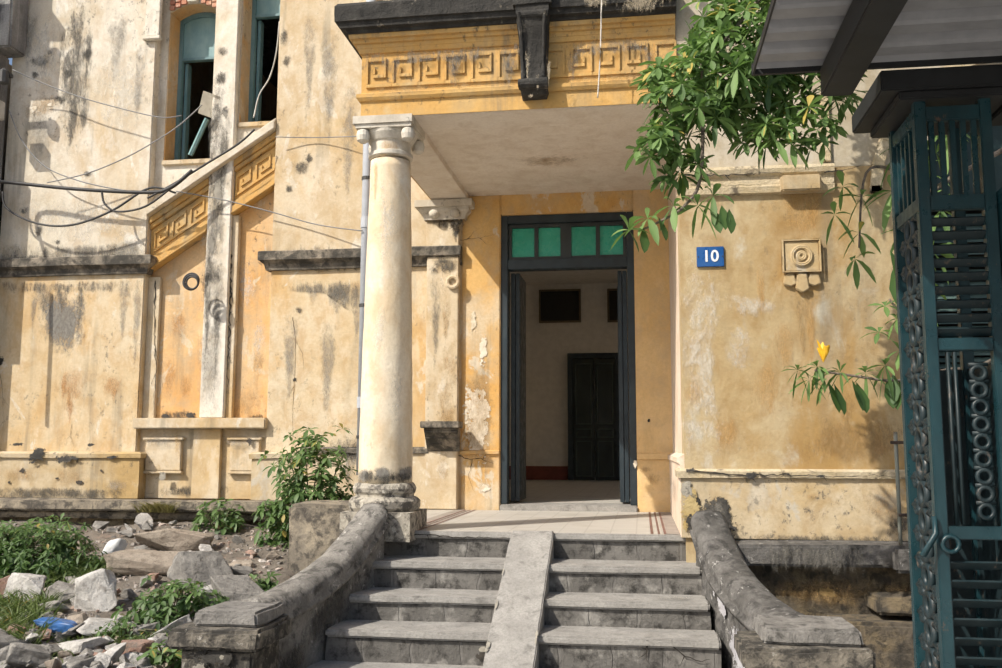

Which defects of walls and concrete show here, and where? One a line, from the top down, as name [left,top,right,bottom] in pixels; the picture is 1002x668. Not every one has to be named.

water stain [29,14,91,145]
crack [151,281,159,415]
water stain [201,260,219,354]
water stain [297,282,358,307]
peeling [471,311,487,366]
peeling [462,382,491,465]
spalling [680,467,700,532]
peeling [713,591,745,668]